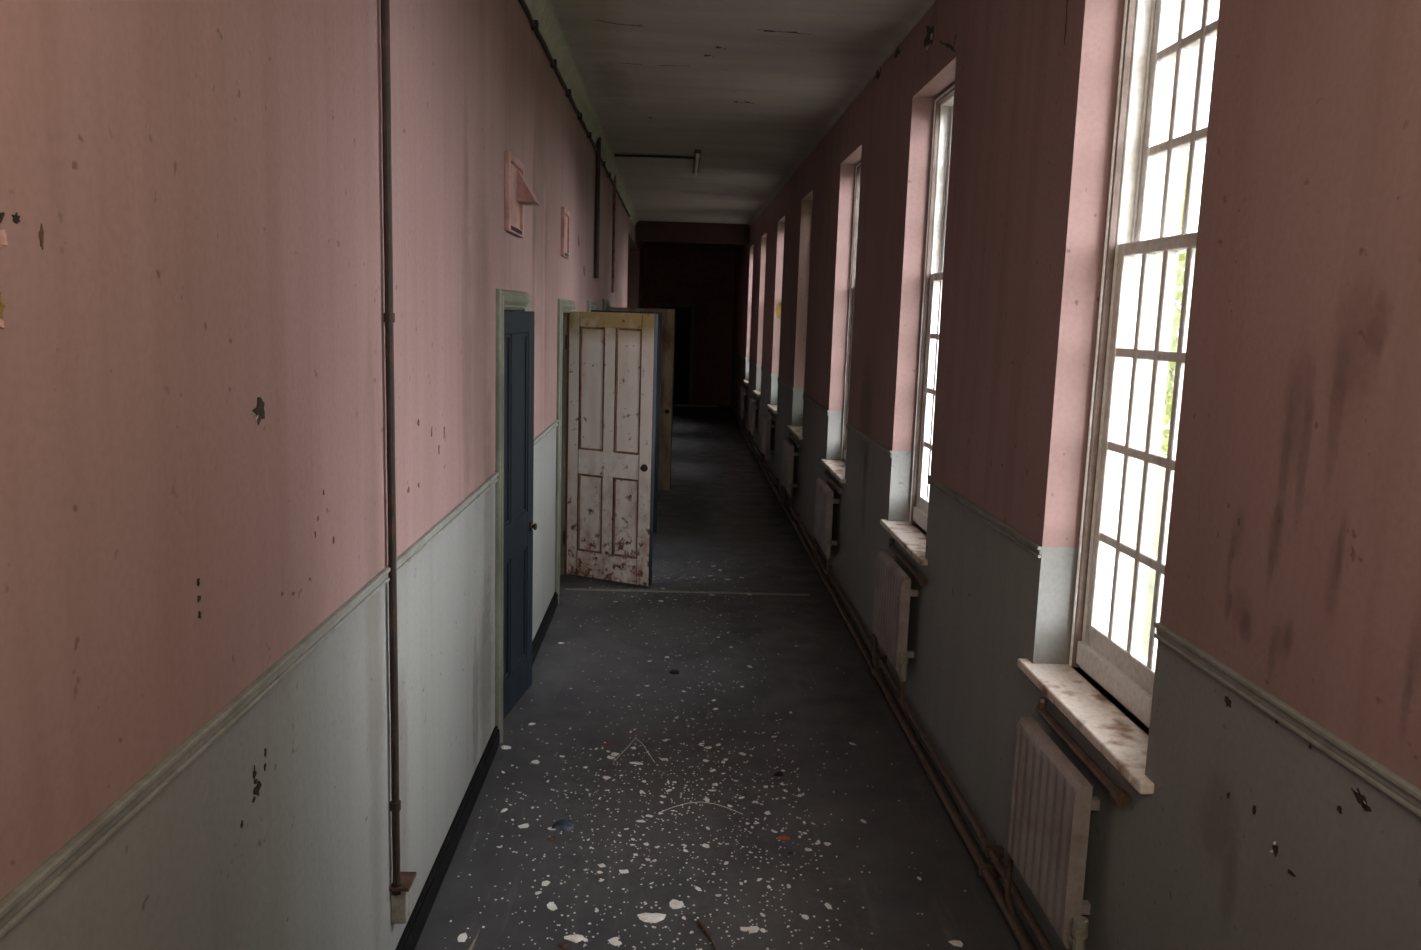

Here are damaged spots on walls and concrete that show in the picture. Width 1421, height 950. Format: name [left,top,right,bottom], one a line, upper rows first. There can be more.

peeling [0,212,21,248]